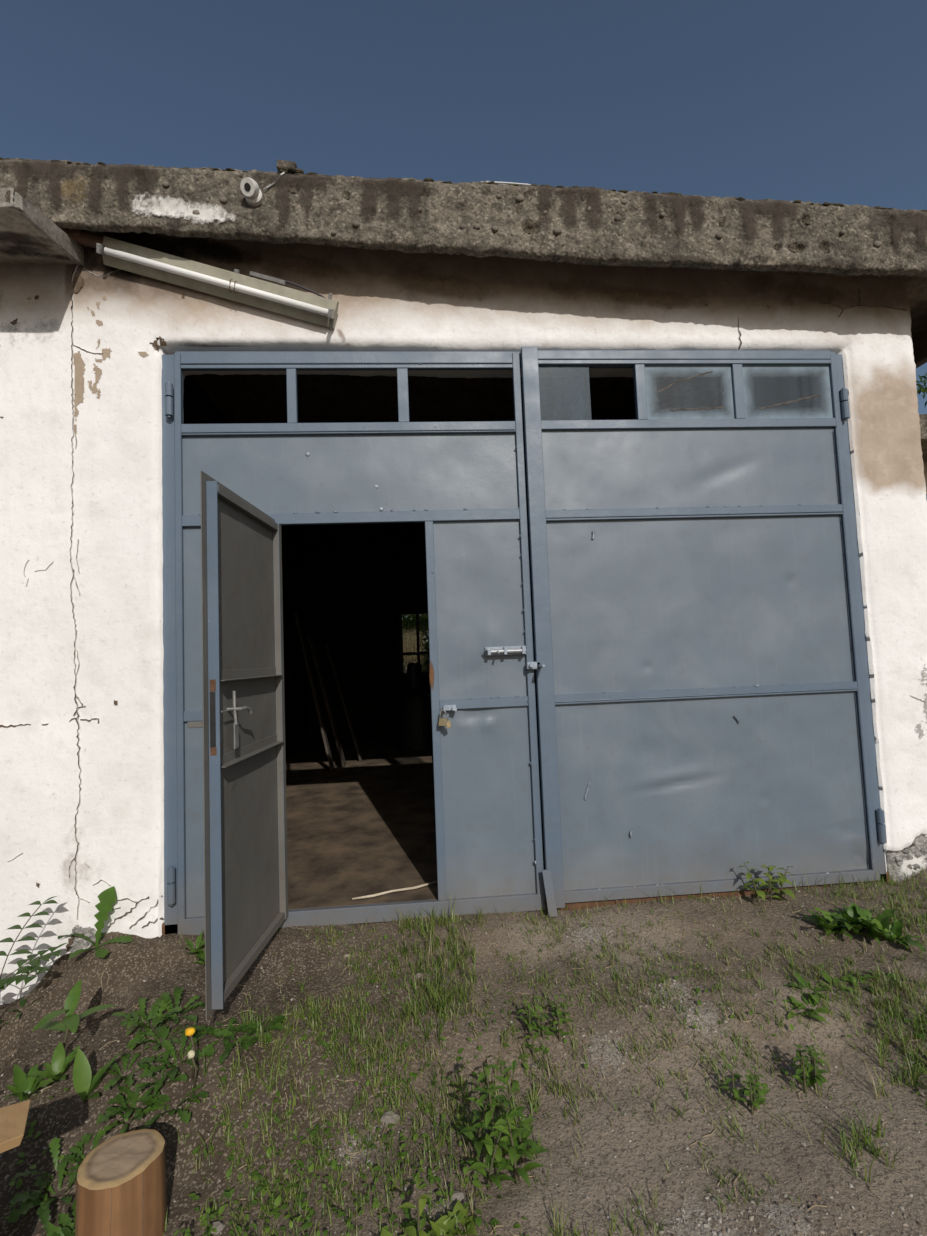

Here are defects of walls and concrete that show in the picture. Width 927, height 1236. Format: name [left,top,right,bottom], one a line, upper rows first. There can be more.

damp [354,177,423,219]
damp [533,184,601,228]
damp [635,192,704,232]
damp [733,200,798,238]
damp [607,289,687,307]
peeling [73,295,110,434]
crack [0,264,163,929]
spalling [886,833,927,882]